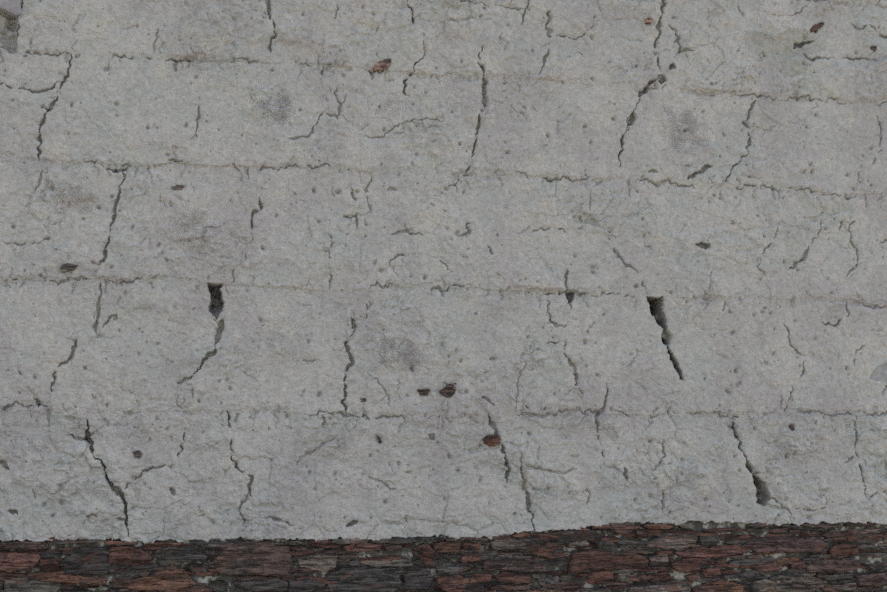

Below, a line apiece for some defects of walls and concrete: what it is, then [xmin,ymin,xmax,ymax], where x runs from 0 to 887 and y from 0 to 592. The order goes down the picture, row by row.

spalling [0,0,22,54]
crack [403,7,425,96]
crack [449,54,506,186]
crack [460,0,594,75]
crack [618,0,693,163]
crack [638,91,886,200]
crack [73,420,185,535]
crack [177,319,224,398]
crack [296,229,422,465]
crack [482,396,574,530]
crack [515,239,758,480]
crack [780,323,887,502]